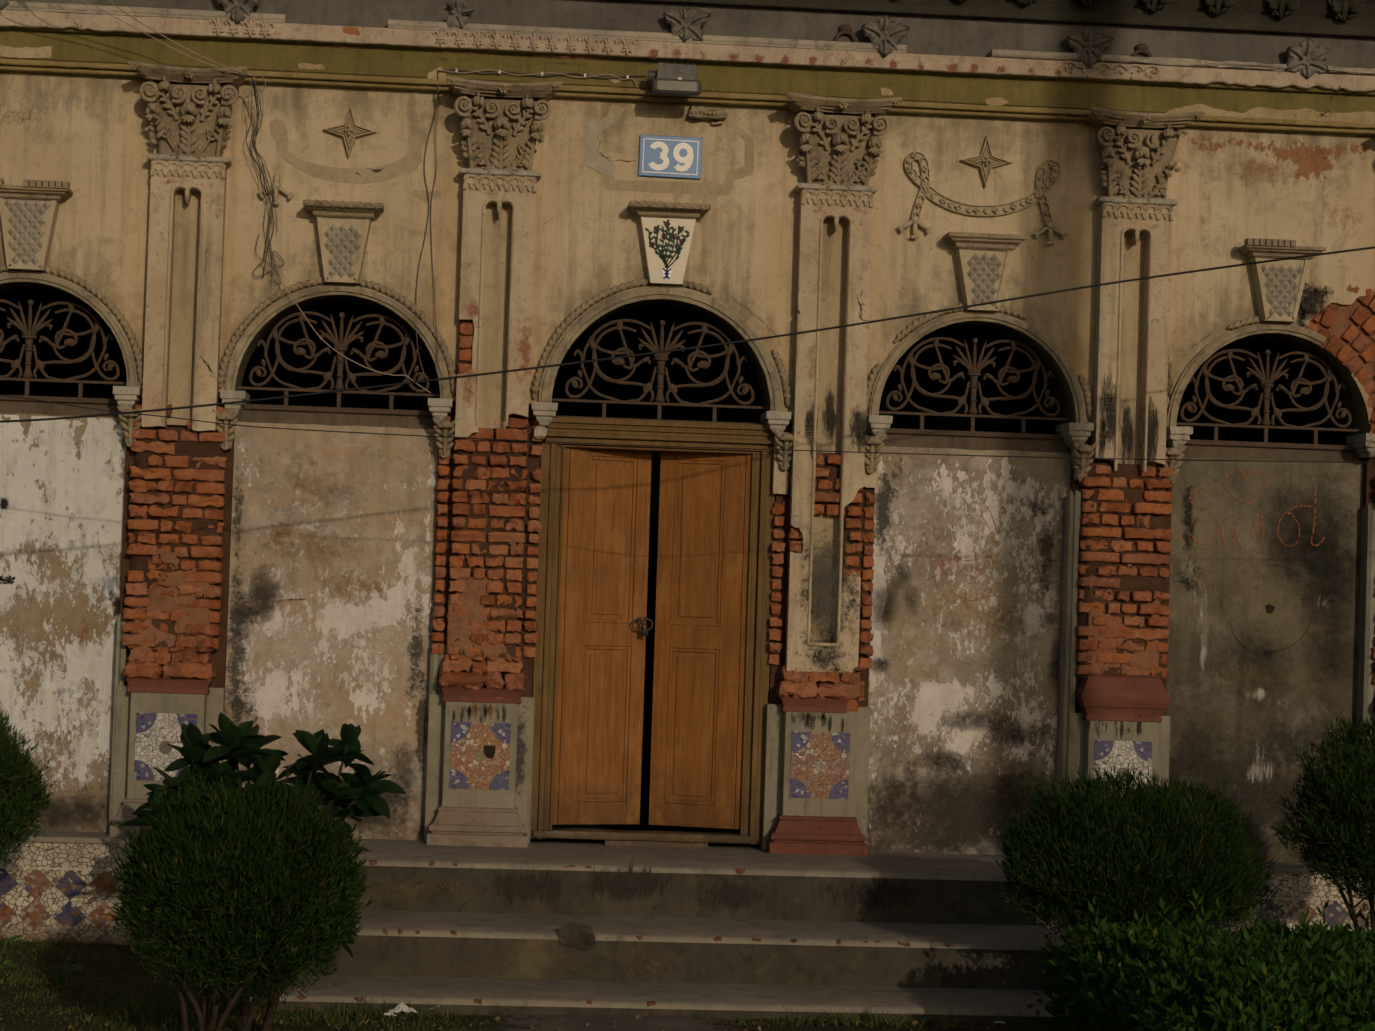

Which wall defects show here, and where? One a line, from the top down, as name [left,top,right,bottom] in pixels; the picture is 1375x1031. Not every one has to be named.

spalling [1188,137,1369,183]
spalling [1306,283,1375,434]
leakage [225,574,277,727]
peeling [0,404,543,811]
spalling [767,432,1174,793]